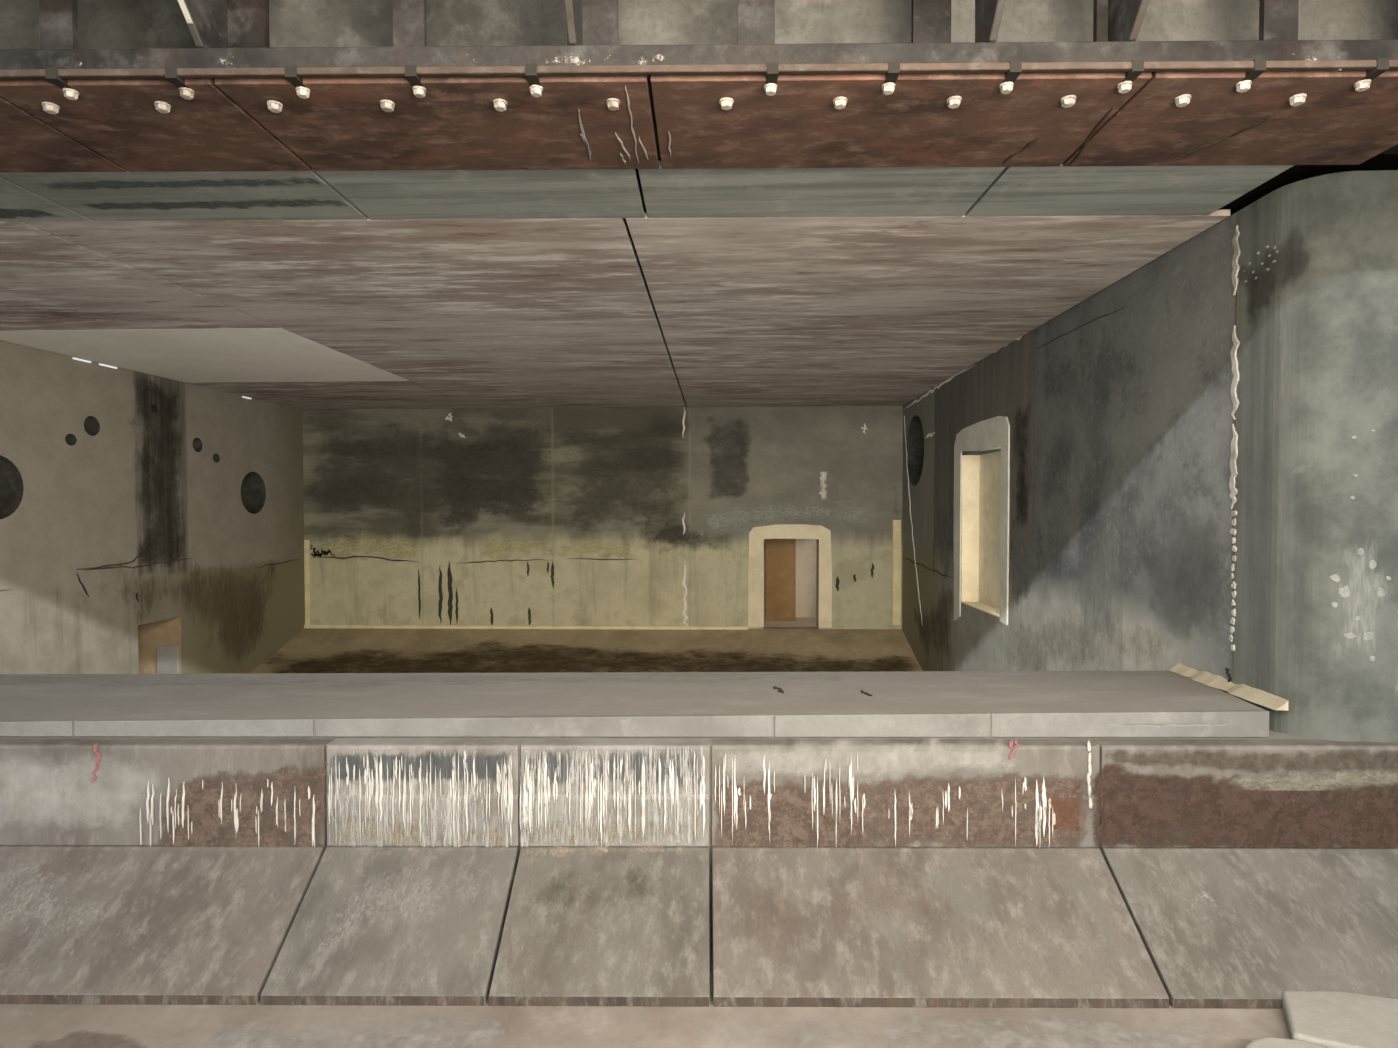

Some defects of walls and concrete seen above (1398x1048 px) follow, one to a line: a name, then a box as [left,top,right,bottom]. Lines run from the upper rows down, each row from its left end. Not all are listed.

crack [77,556,194,603]
water stain [218,750,775,847]